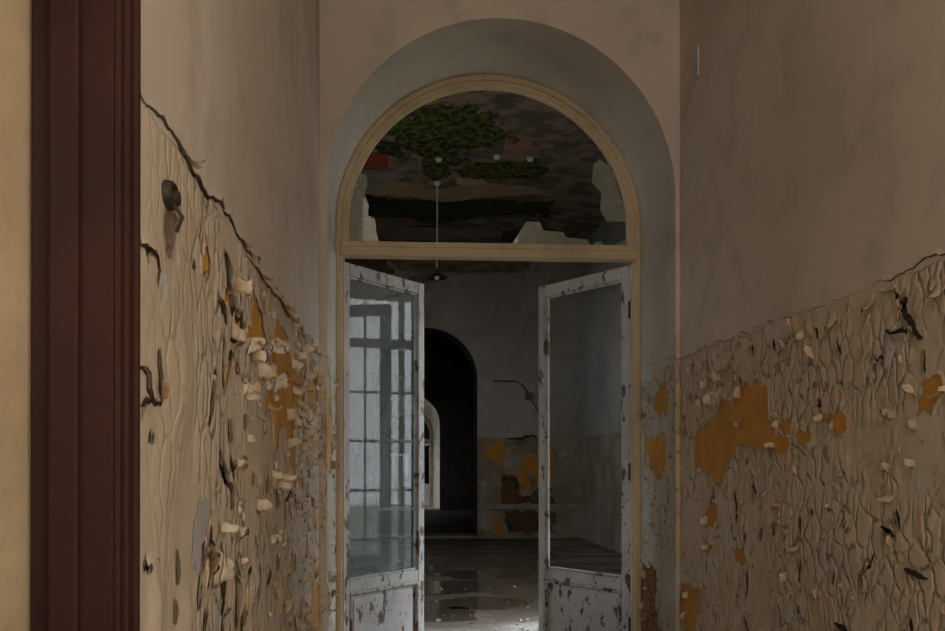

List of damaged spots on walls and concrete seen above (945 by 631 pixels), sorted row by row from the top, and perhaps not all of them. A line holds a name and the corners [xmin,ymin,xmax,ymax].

peeling [141,87,341,631]
peeling [635,378,670,419]
peeling [888,354,945,444]
spalling [482,437,558,538]
peeling [645,430,668,482]
peeling [679,360,915,631]
spalling [638,560,659,631]